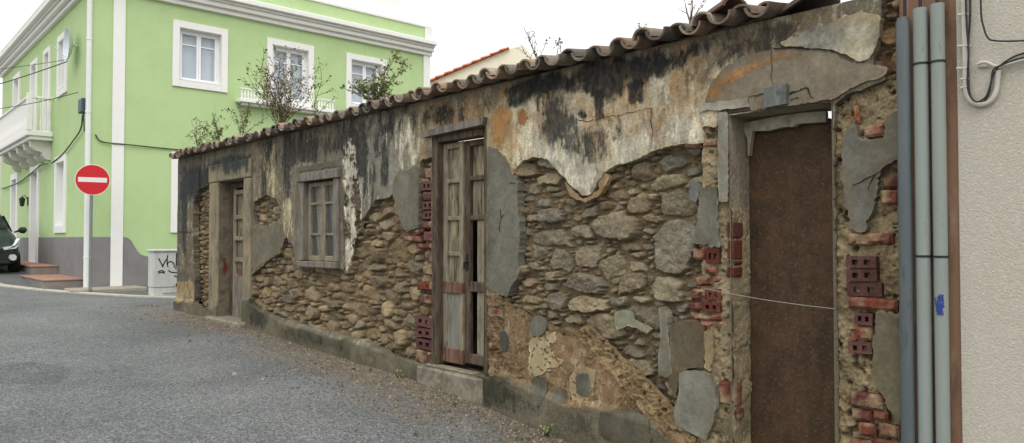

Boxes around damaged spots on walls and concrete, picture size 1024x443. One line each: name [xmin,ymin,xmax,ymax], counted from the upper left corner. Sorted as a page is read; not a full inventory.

spalling [198,187,209,309]
damp [180,106,423,270]
spalling [251,160,432,363]
damp [504,37,715,190]
crack [576,108,653,143]
spalling [486,126,752,443]
crack [748,47,827,100]
spalling [781,0,901,443]